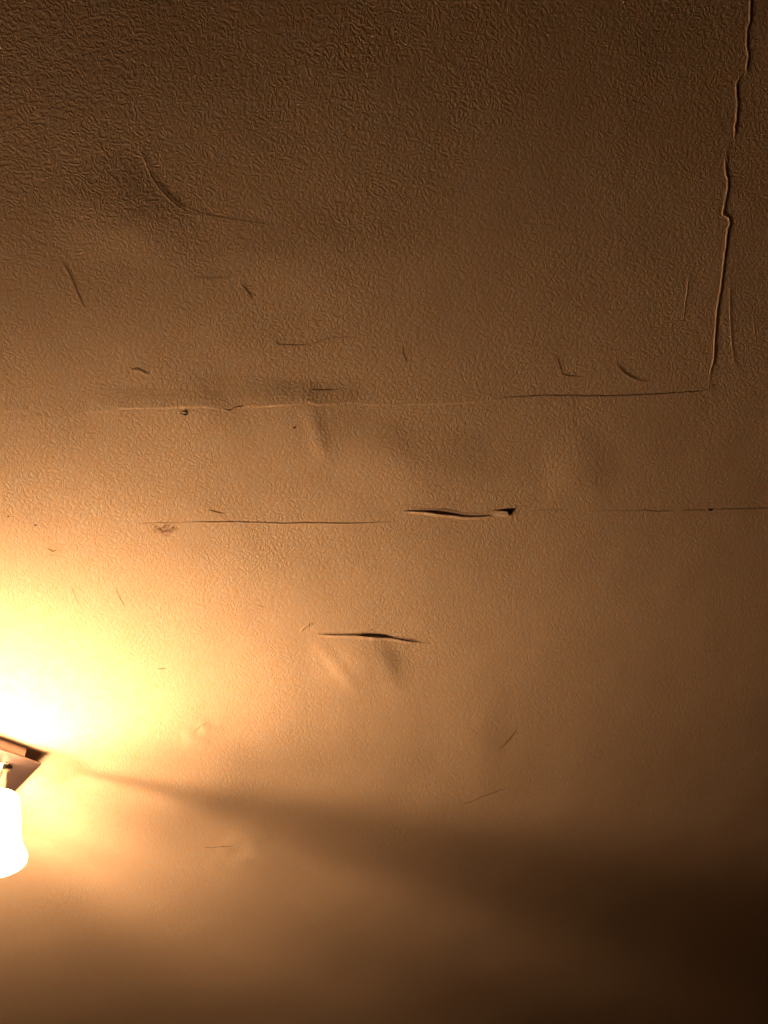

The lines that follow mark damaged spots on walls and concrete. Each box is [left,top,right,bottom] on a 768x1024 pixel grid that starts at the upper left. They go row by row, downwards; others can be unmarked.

crack [708,0,756,394]
crack [143,510,391,525]